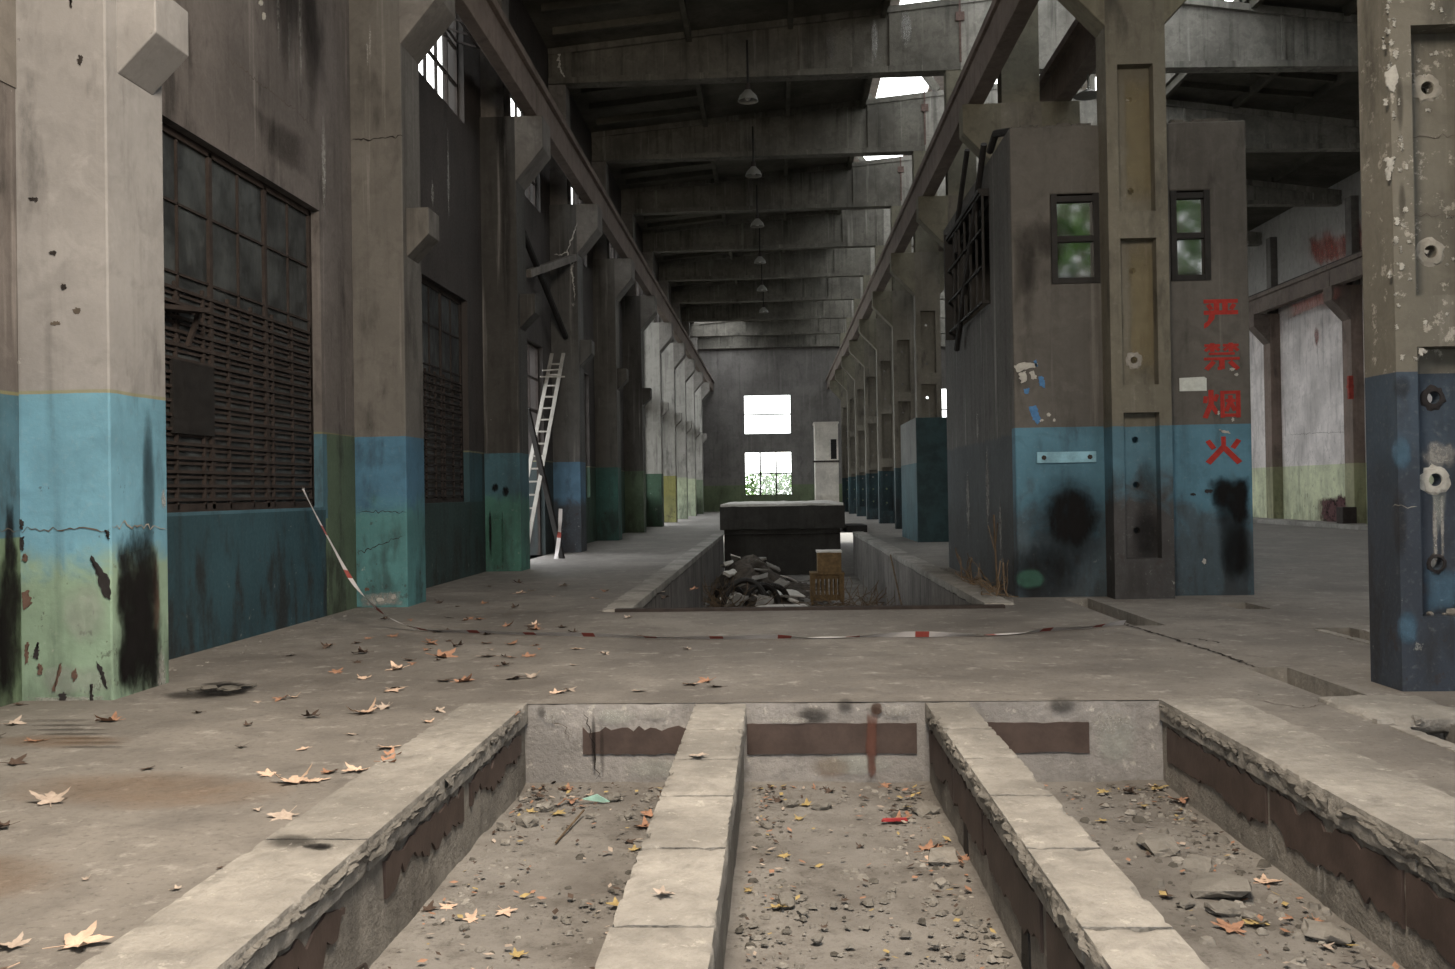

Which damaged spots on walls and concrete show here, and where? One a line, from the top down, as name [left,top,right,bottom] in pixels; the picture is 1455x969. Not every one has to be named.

peeling [1381,0,1442,181]
spalling [1387,207,1455,330]
damp [0,510,21,688]
damp [118,451,166,685]
spalling [227,700,1455,969]